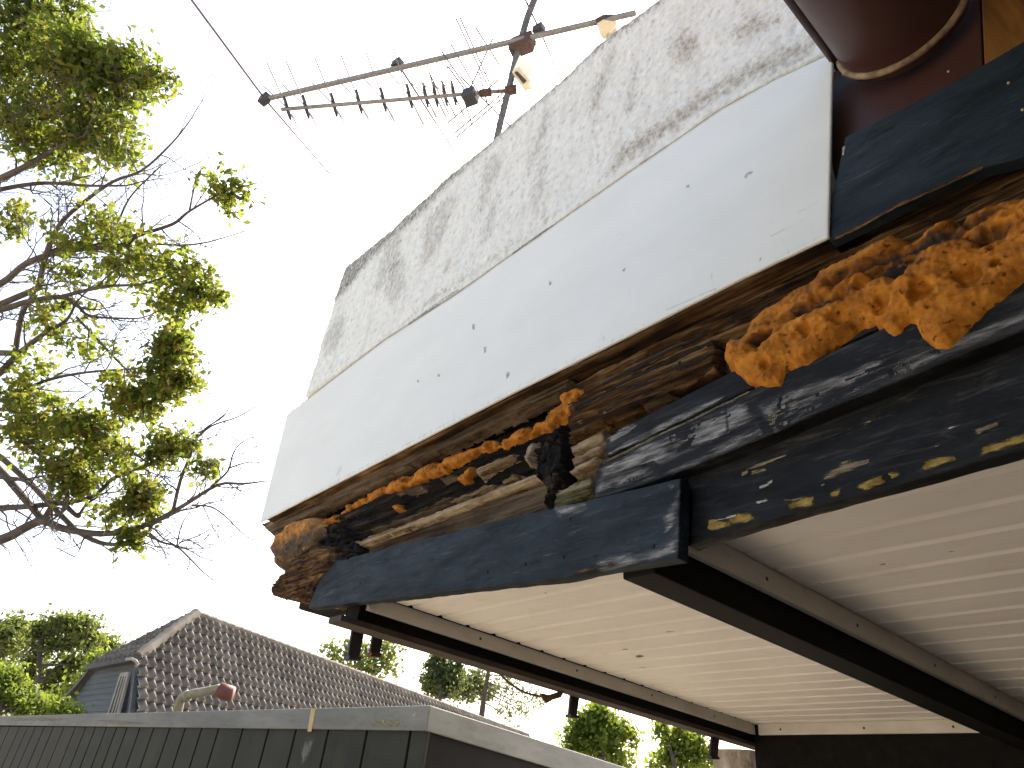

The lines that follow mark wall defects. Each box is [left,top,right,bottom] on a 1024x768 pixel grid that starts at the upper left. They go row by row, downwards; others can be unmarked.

peeling [741,455,786,503]
peeling [821,460,869,486]